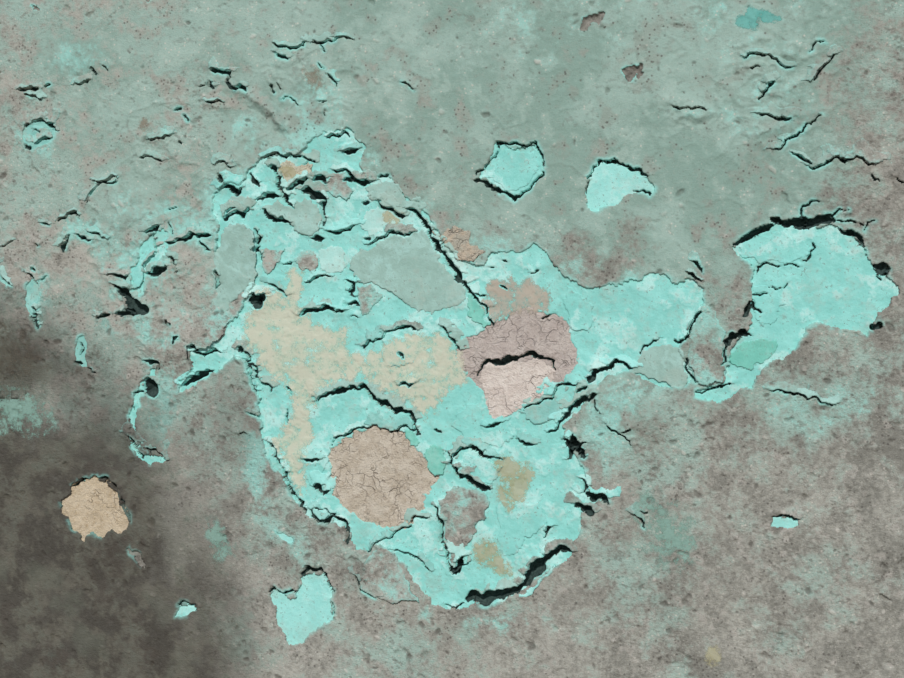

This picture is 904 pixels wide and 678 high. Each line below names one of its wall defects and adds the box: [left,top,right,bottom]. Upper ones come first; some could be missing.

peeling [100,127,900,610]
flaking render [62,475,131,542]
peeling [270,565,335,645]